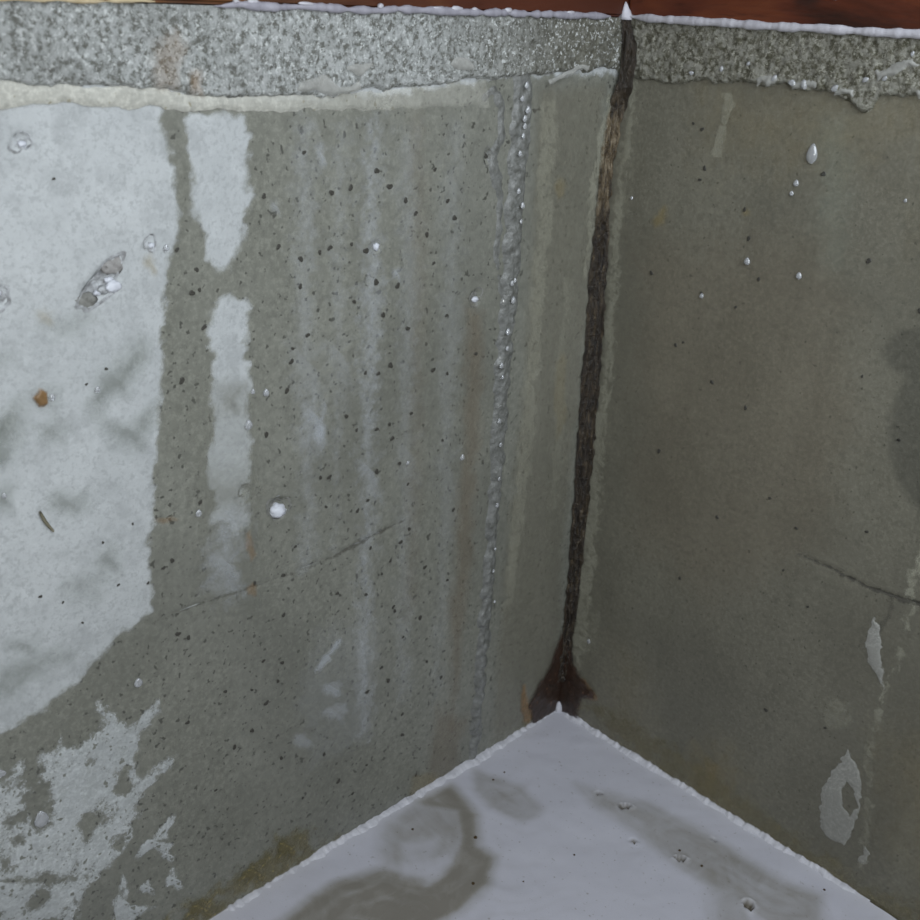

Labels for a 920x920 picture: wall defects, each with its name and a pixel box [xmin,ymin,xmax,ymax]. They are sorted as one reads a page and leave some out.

crack [557,19,638,683]
leakage [0,57,619,920]
leakage [572,75,920,920]
crack [798,553,920,606]
rust [521,634,597,723]
peeling [865,617,884,687]
peeling [819,749,862,845]